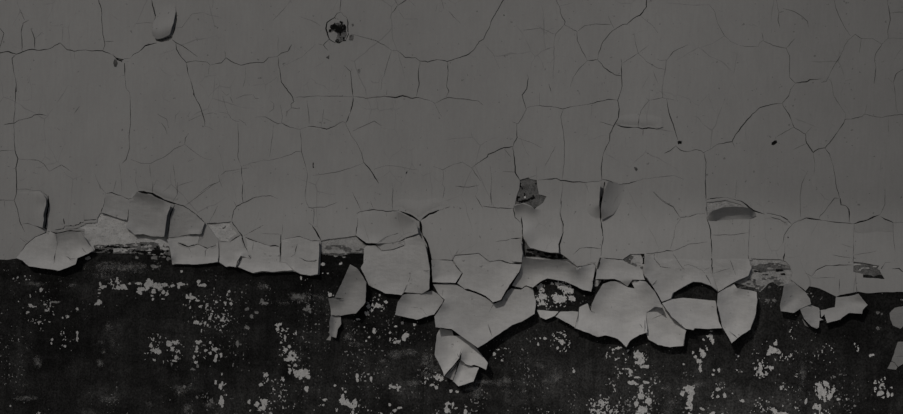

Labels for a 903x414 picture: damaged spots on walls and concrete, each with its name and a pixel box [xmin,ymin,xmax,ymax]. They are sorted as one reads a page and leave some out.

spalling [324,11,354,44]
crack [0,0,503,266]
crack [352,0,903,336]
peeling [13,177,867,414]
spalling [853,262,882,277]
peeling [876,306,903,329]
peeling [874,342,903,399]